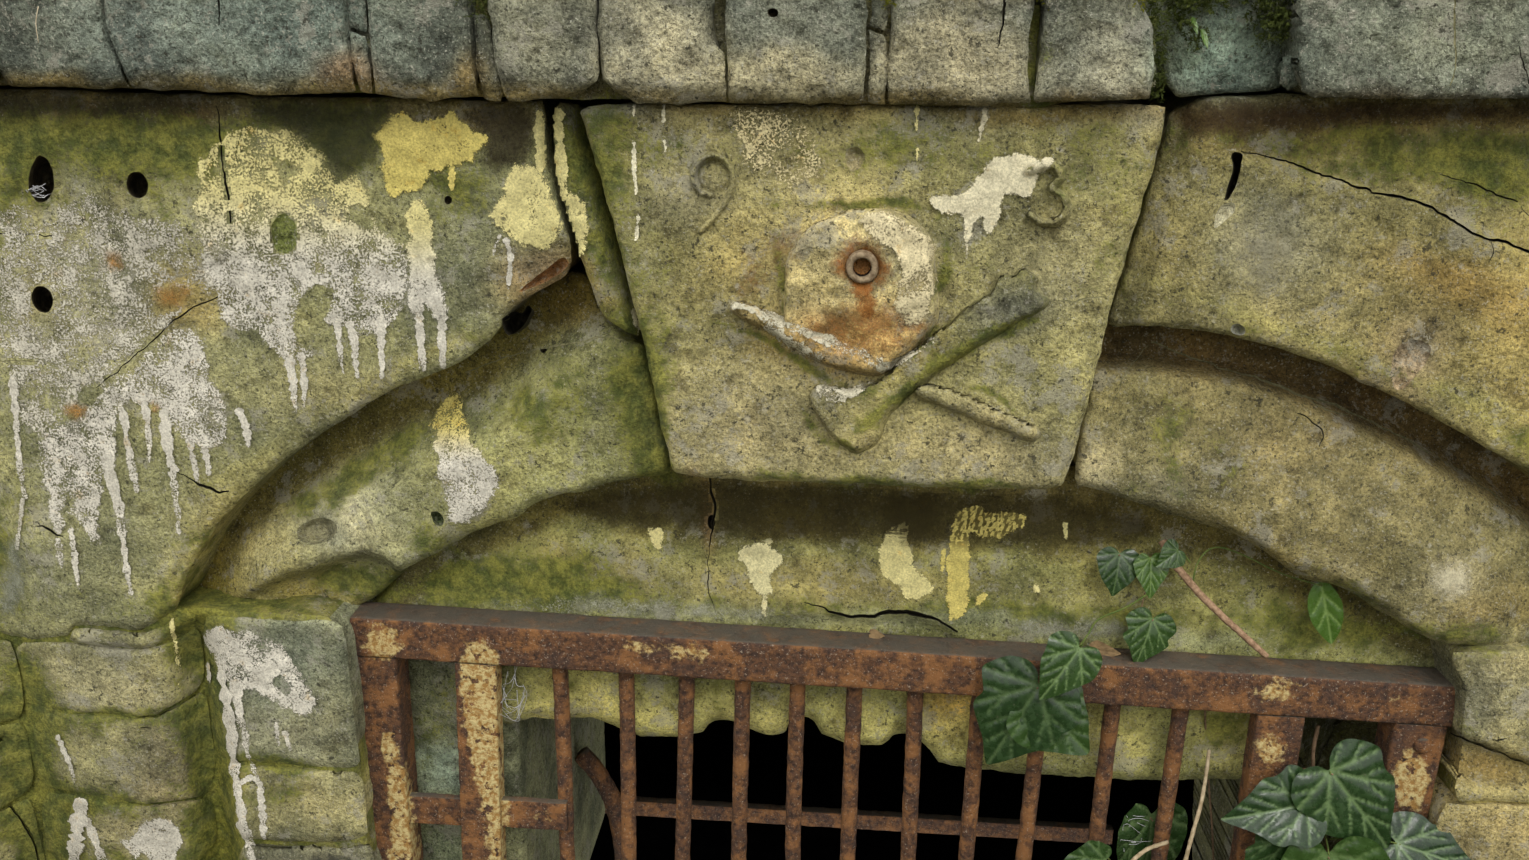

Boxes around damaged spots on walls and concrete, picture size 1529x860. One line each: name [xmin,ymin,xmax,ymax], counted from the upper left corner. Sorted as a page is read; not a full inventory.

crack [1242,151,1529,262]
damp [0,97,590,612]
rust [809,247,920,348]
crack [707,478,717,614]
crack [805,602,958,632]
damp [203,625,318,860]